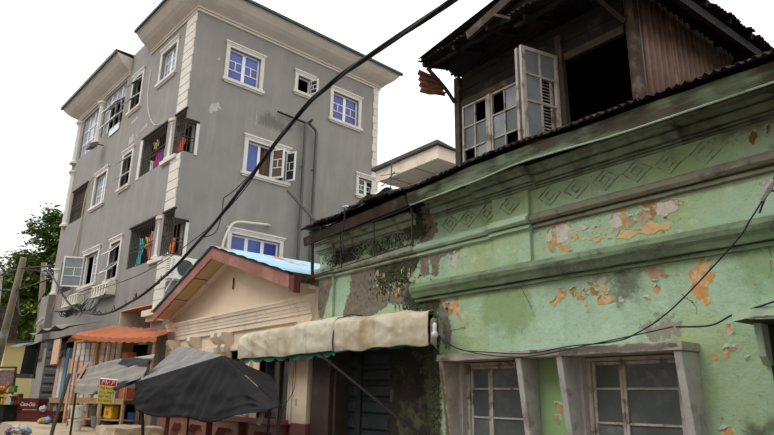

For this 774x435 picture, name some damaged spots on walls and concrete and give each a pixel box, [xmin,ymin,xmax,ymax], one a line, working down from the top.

peeling [545,196,684,253]
spalling [318,277,333,319]
spalling [343,247,462,317]
peeling [549,269,624,312]
peeling [689,257,716,306]
peeling [710,321,751,362]